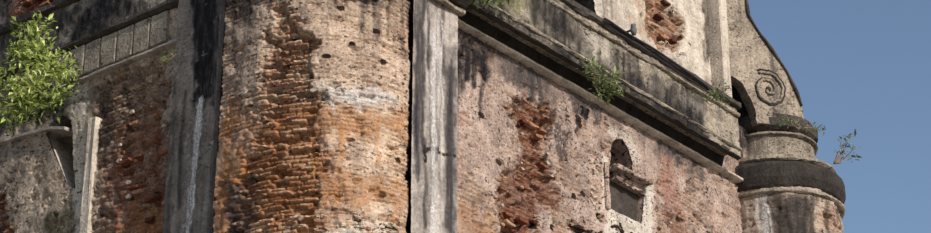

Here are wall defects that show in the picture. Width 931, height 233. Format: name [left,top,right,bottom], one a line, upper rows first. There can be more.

spalling [639,0,691,57]
water stain [0,79,68,142]
spalling [116,105,168,233]
spalling [225,72,398,233]
water stain [407,0,547,233]
spalling [491,99,557,231]
spalling [575,105,590,129]
flaking render [572,158,604,222]